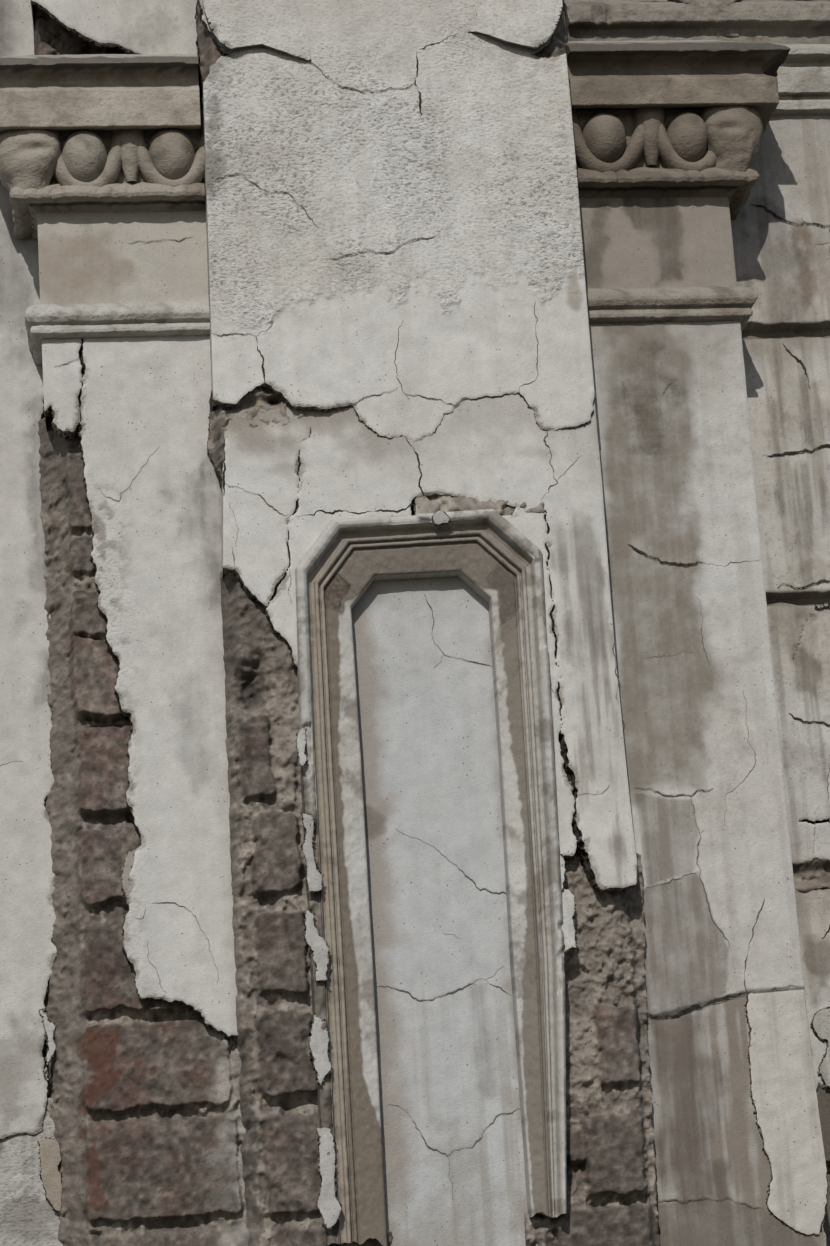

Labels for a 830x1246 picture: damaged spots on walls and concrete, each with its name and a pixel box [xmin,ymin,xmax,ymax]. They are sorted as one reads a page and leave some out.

flaking render [207,387,305,492]
flaking render [37,414,722,1246]